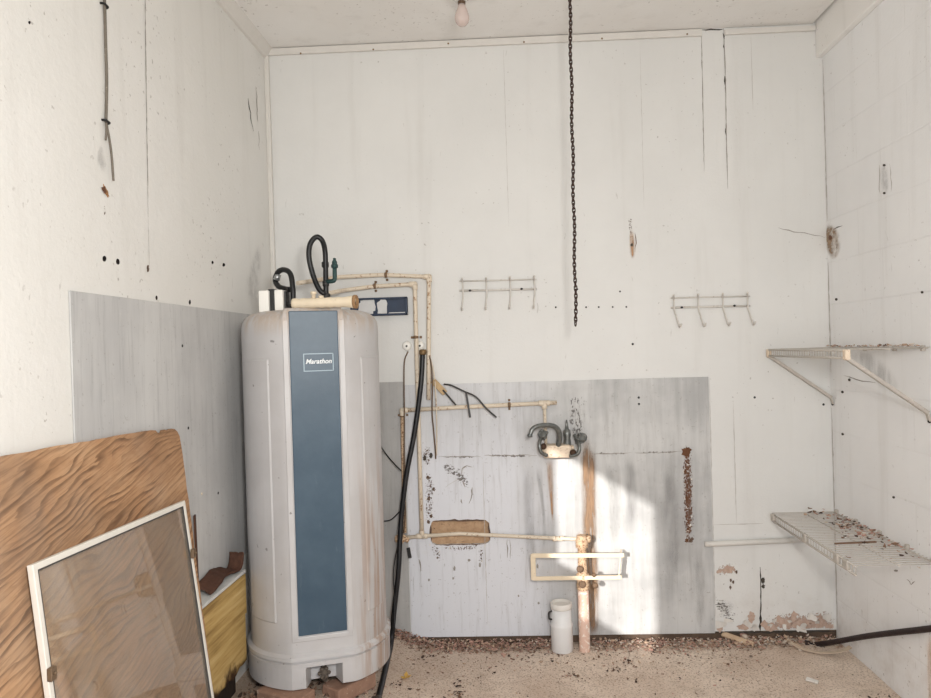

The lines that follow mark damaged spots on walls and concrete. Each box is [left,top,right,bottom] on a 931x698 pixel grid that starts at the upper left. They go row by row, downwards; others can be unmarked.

rust [681,446,696,543]
peeling [716,565,738,589]
flaking render [716,600,834,633]